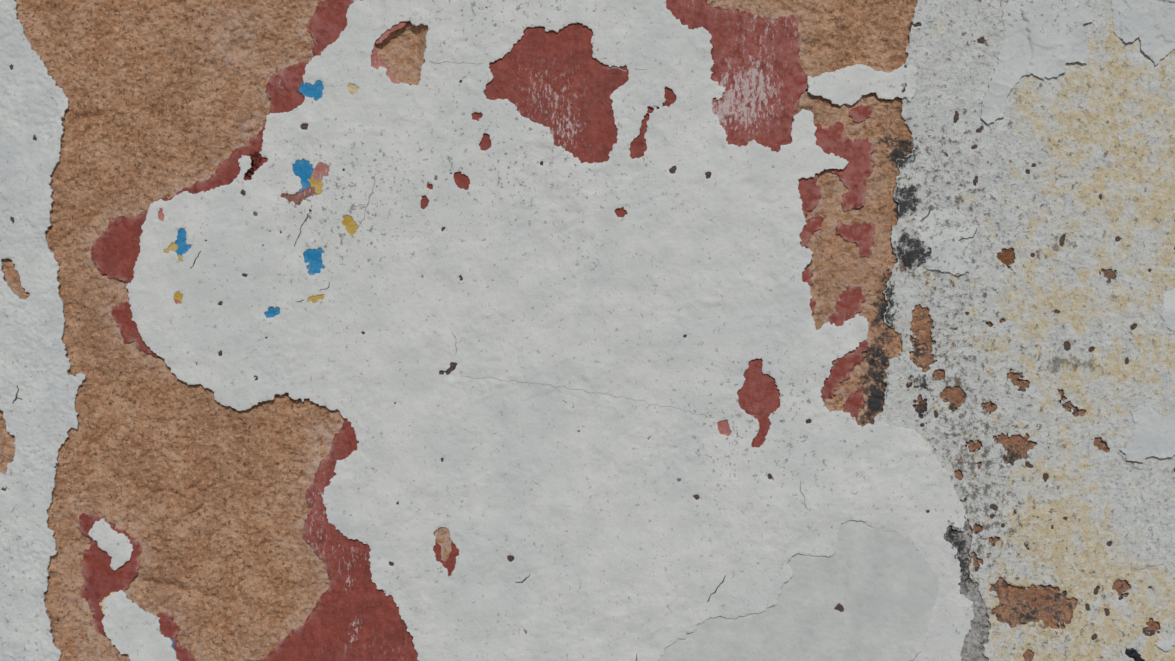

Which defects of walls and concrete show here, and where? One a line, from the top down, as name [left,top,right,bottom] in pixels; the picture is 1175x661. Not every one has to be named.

spalling [371,21,428,86]
peeling [484,23,676,164]
peeling [479,134,491,151]
peeling [421,172,470,209]
peeling [2,259,30,300]
peeling [15,0,418,661]
peeling [666,0,1175,661]
peeling [0,410,16,491]
peeling [433,527,459,576]